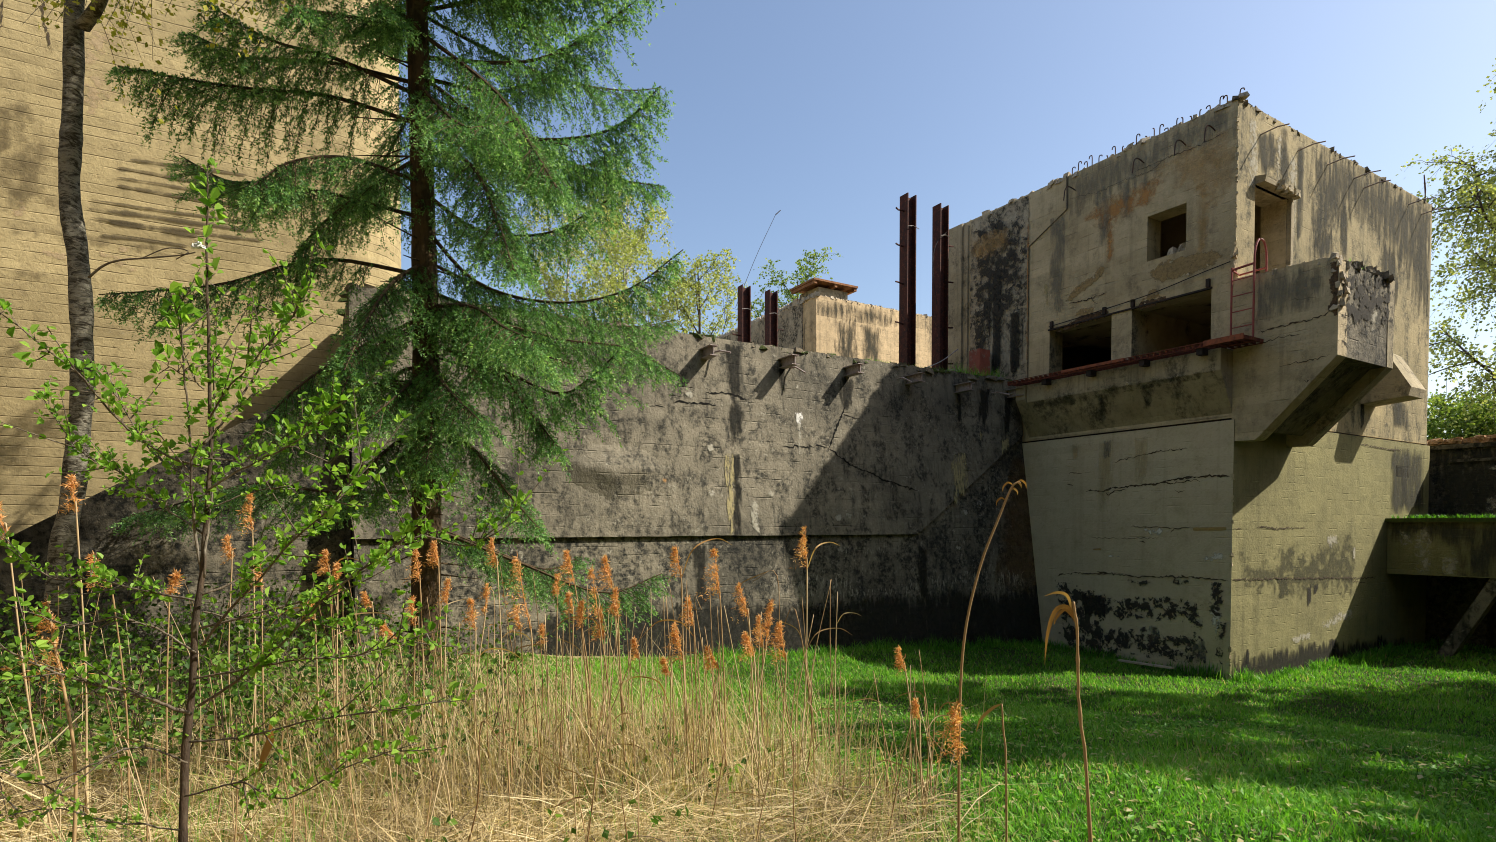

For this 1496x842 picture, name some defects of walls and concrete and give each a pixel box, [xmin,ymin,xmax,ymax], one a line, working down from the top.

damp [970,217,1027,453]
damp [1044,217,1064,310]
peeling [962,87,1448,304]
spalling [1328,260,1340,316]
crack [786,406,917,491]
damp [536,533,1405,679]